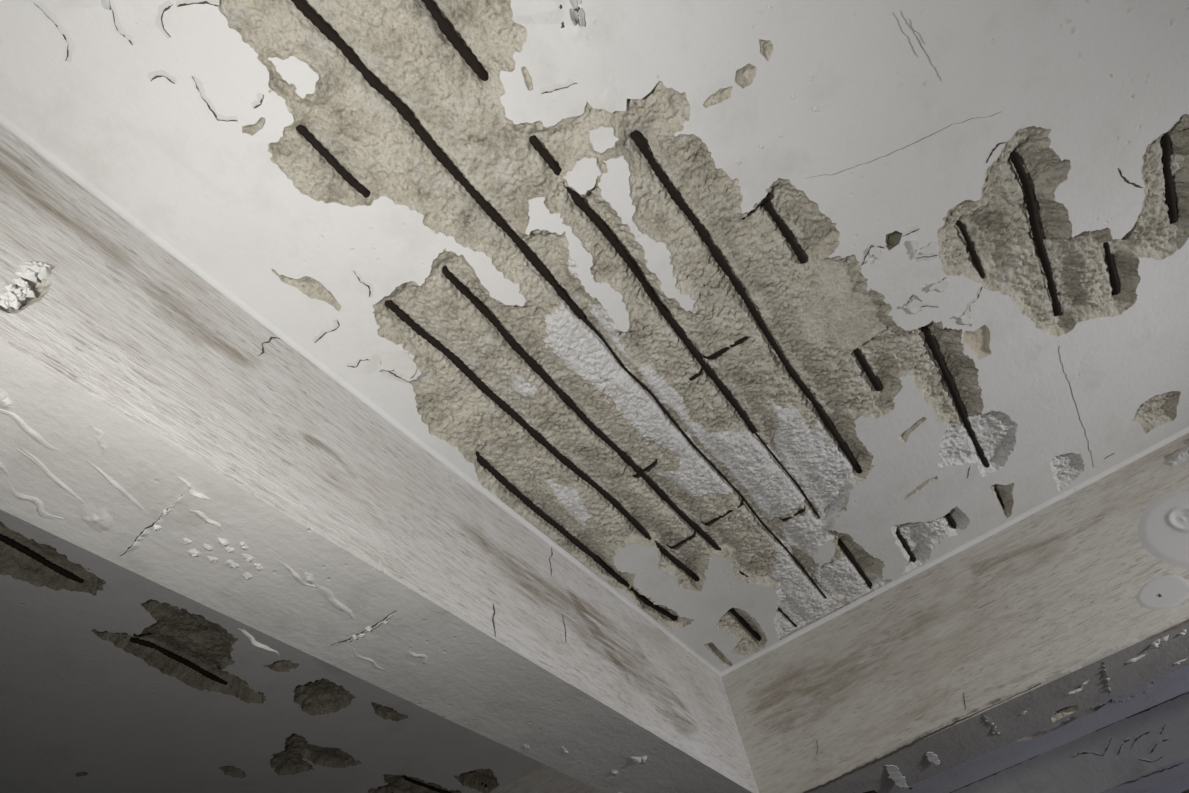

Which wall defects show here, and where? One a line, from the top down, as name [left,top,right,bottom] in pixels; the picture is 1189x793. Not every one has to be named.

crack [893,11,941,80]
crack [809,112,1006,178]
spalling [937,114,1189,337]
flaking render [0,261,52,314]
spalling [218,0,1018,667]
spalling [1131,391,1181,434]
spalling [1050,453,1085,491]
spalling [0,521,106,596]
spalling [91,599,267,704]
spalling [293,678,356,716]
spalling [270,733,362,775]
spalling [368,769,500,793]